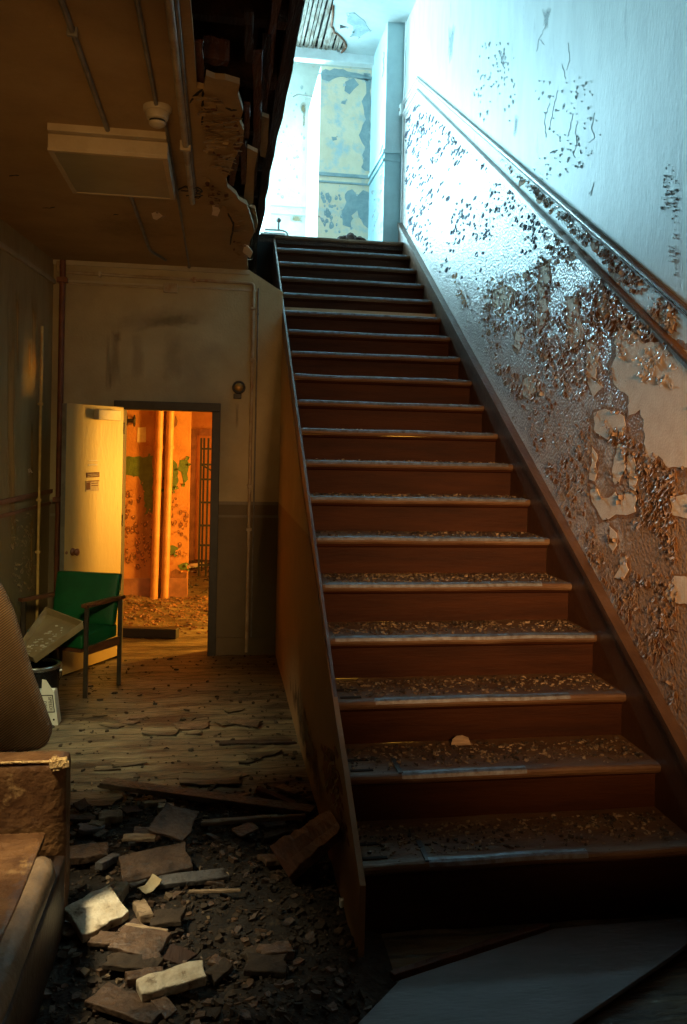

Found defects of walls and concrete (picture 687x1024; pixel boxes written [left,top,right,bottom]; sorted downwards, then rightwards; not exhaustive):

peeling [318,68,384,233]
peeling [404,80,687,705]
peeling [124,454,191,585]